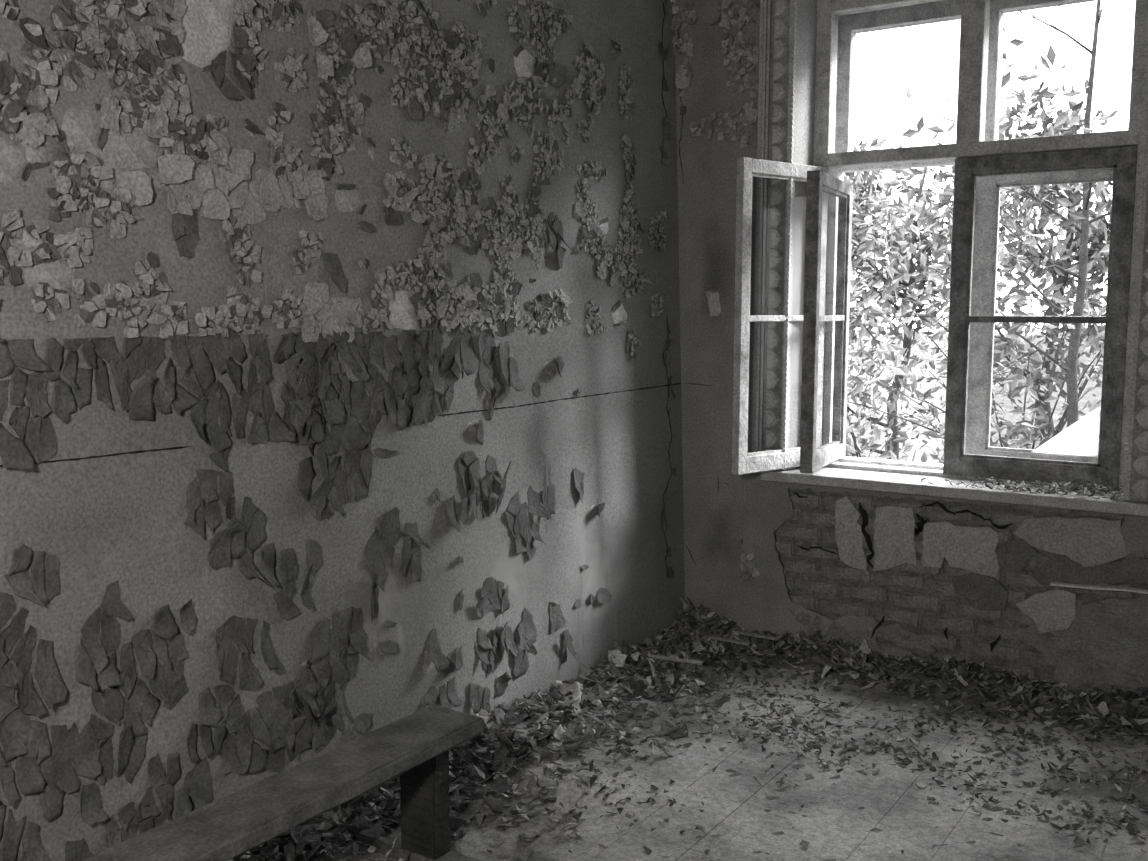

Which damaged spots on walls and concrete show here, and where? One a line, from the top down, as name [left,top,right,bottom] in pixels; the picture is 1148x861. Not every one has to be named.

flaking render [0,0,664,861]
flaking render [752,492,1148,697]